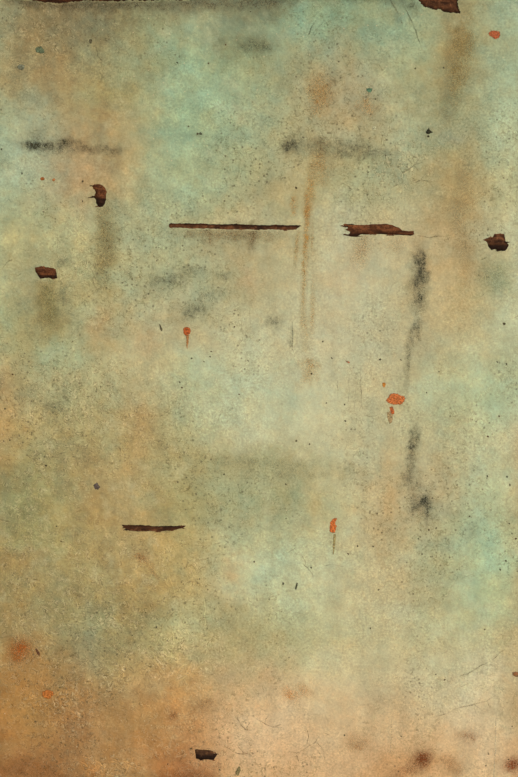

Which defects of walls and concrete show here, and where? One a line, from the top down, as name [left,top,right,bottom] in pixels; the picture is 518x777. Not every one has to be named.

flaking render [419,0,460,14]
flaking render [82,180,107,207]
flaking render [341,224,414,237]
flaking render [483,233,509,252]
flaking render [35,265,57,279]
leakage [415,254,426,301]
corrosion [382,383,405,424]
flaking render [190,748,220,770]